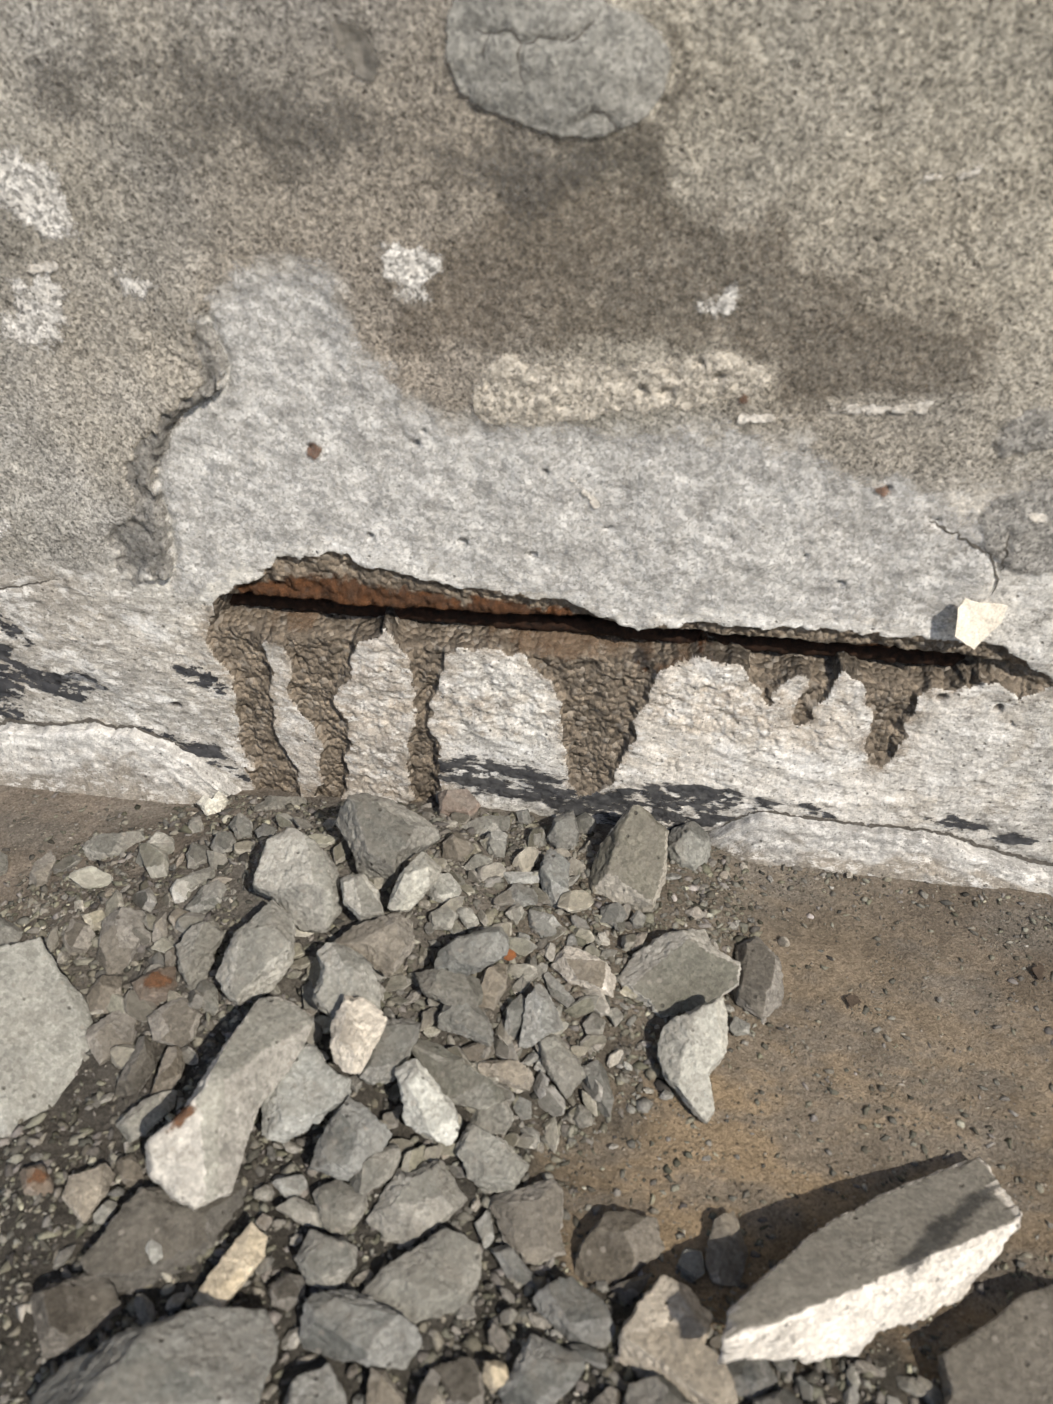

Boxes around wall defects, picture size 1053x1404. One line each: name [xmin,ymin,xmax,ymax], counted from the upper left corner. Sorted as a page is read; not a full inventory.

leakage [163,47,414,182]
leakage [424,76,689,226]
leakage [959,166,981,180]
leakage [737,412,792,424]
leakage [831,401,934,415]
rust [237,574,591,617]
peeling [108,266,1053,804]
crack [929,520,1011,596]